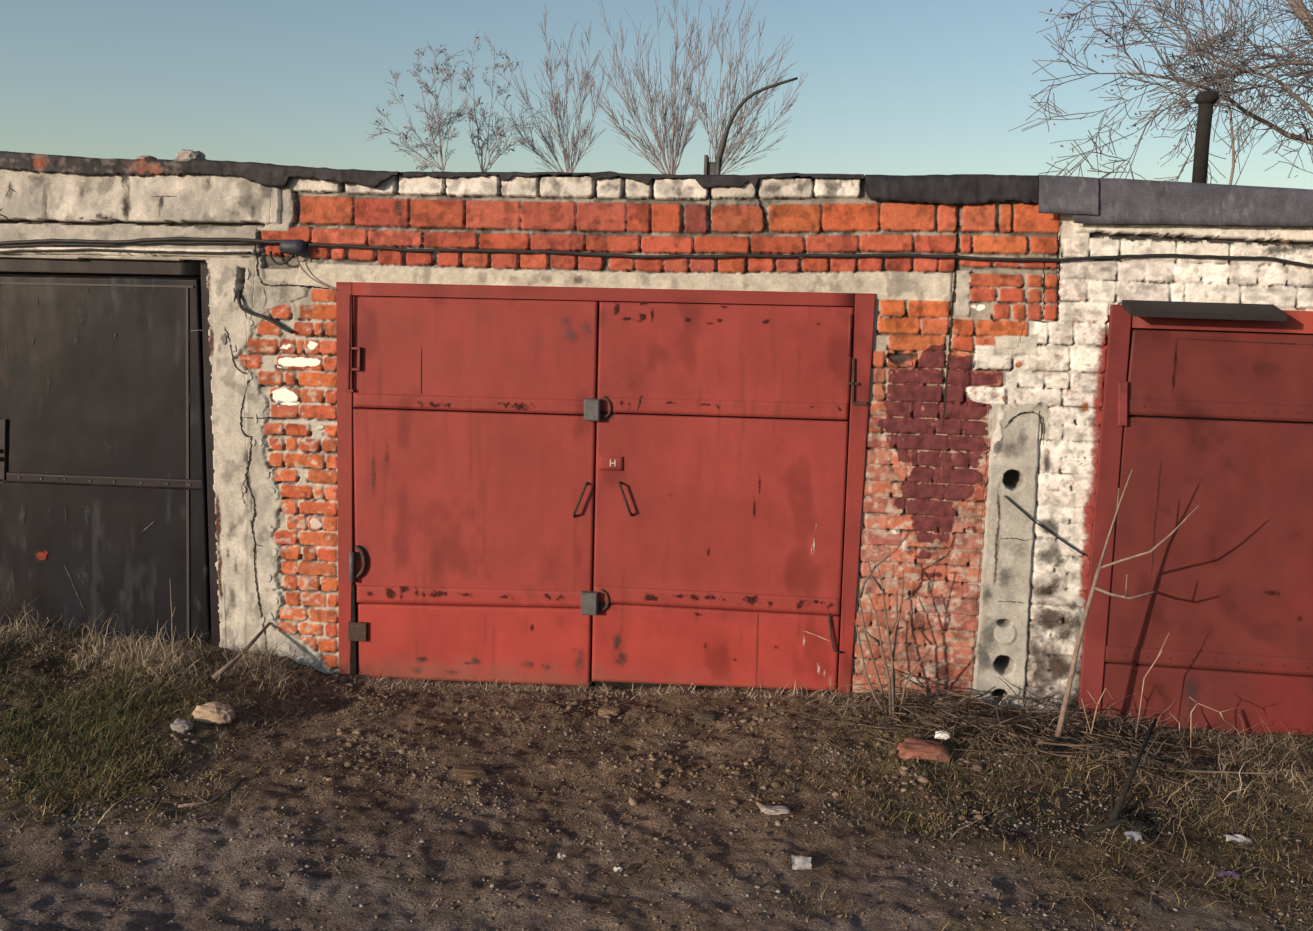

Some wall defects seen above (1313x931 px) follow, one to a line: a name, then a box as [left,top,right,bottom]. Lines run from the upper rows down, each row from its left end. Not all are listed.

crack [936,205,972,430]
crack [223,234,330,648]
peeling [877,343,1007,578]